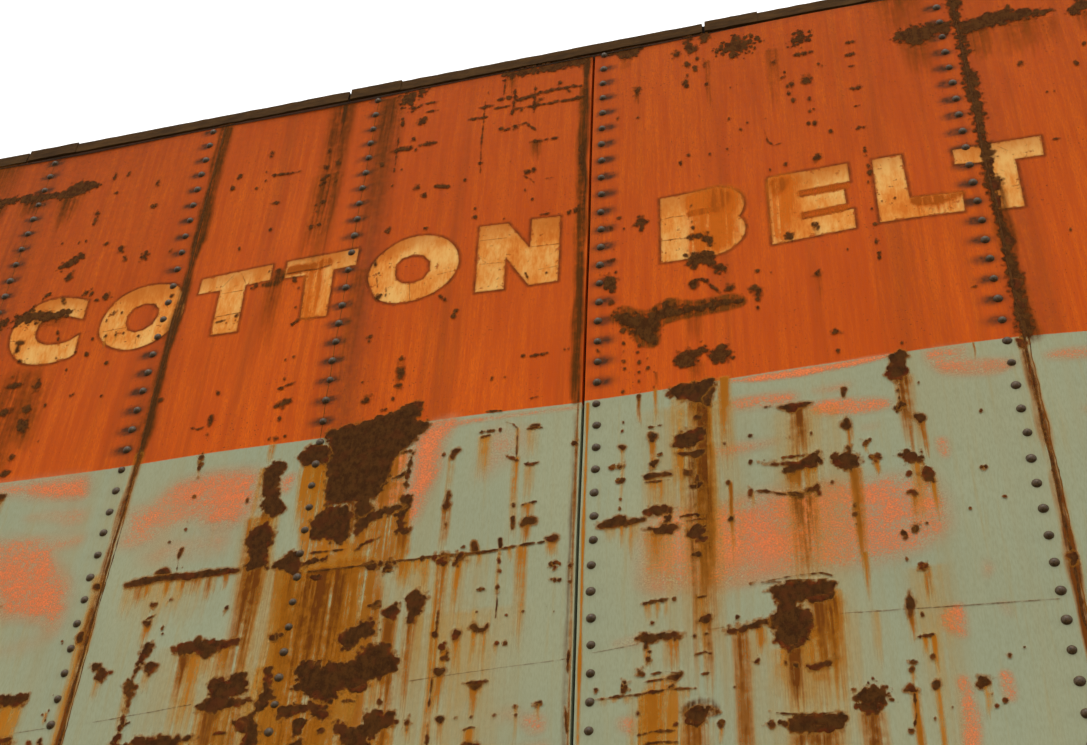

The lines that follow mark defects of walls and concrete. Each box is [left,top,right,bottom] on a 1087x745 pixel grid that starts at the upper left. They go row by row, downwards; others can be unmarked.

rust [672,33,765,88]
rust [786,29,823,66]
rust [0,171,131,216]
rust [0,292,73,341]
rust [0,376,41,444]
rust [25,123,232,745]
rust [110,55,761,745]
rust [748,401,883,586]
rust [905,590,938,662]
rust [0,692,30,745]
rust [765,659,954,745]
rust [975,674,1008,708]